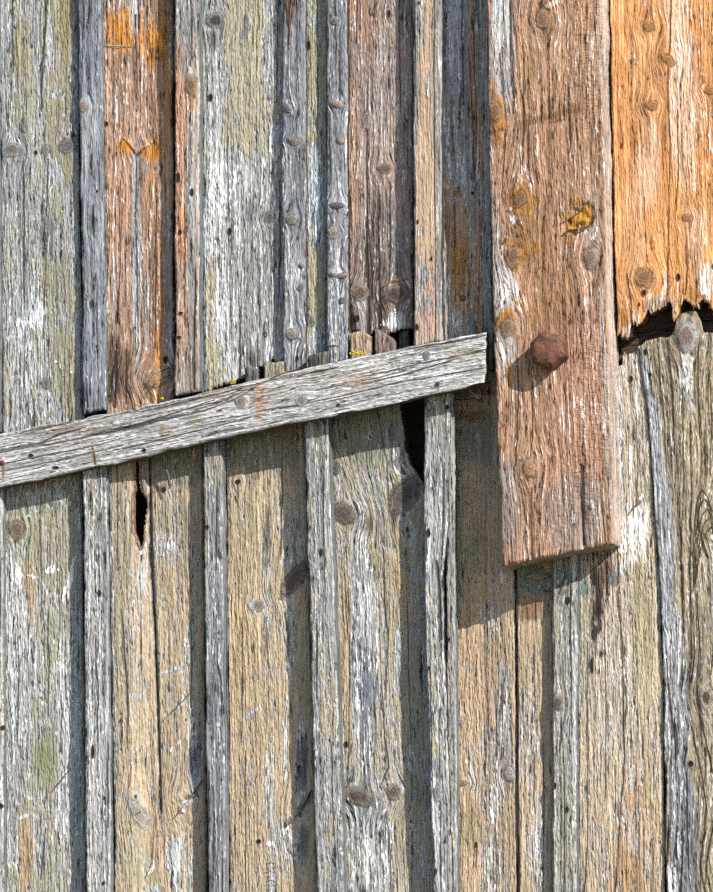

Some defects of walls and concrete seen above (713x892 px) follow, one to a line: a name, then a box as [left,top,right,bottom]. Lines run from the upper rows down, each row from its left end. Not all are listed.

crack [499,0,531,195]
crack [0,0,486,856]
crack [39,828,47,879]
crack [213,785,224,892]
crack [218,571,247,890]
crack [381,457,445,892]